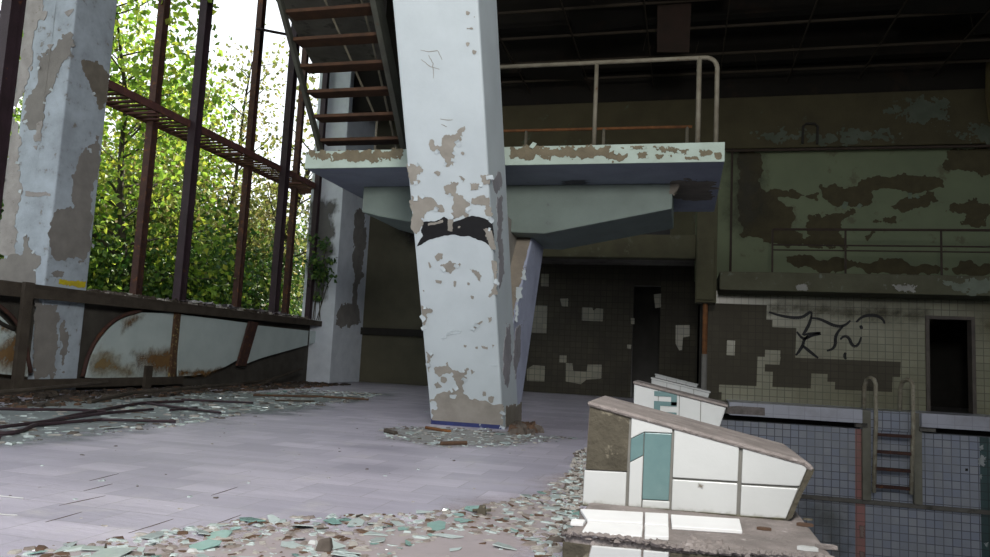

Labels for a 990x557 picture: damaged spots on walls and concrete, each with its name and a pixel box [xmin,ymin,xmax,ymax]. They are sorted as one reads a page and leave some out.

peeling [81,59,110,110]
peeling [0,0,102,284]
peeling [509,142,722,163]
peeling [669,178,721,201]
peeling [737,94,990,296]
peeling [305,126,530,388]
corrosion [94,350,221,377]
peeling [425,350,522,429]
peeling [707,303,901,416]